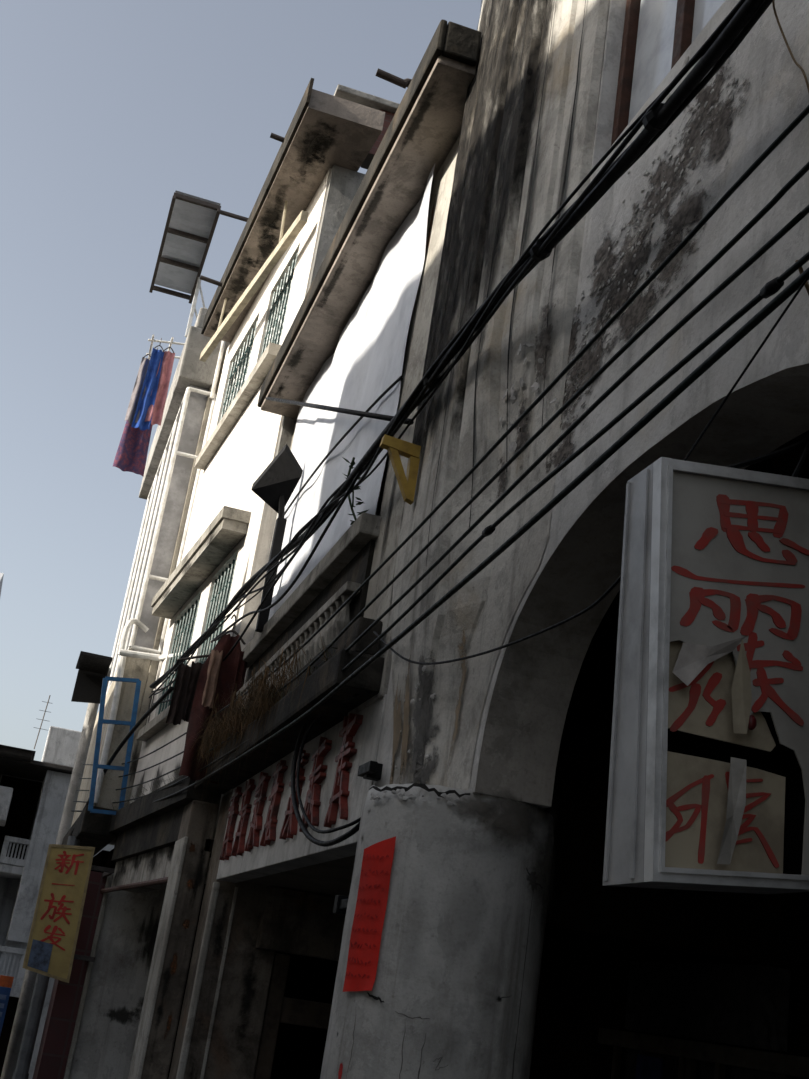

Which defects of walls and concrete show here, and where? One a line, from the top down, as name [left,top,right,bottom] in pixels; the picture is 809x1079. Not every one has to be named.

water stain [403,86,434,145]
water stain [300,123,337,175]
water stain [555,120,572,221]
water stain [212,186,285,330]
water stain [317,260,347,307]
water stain [353,181,386,244]
water stain [413,0,553,459]
water stain [382,475,403,553]
water stain [140,908,159,967]
water stain [107,998,144,1024]